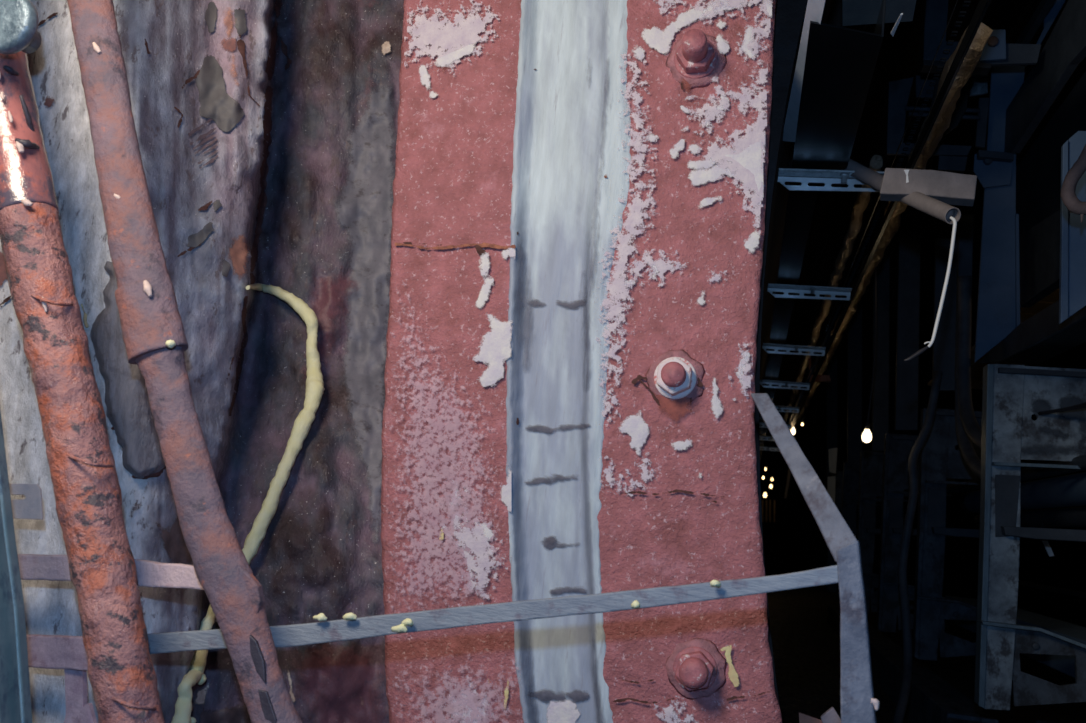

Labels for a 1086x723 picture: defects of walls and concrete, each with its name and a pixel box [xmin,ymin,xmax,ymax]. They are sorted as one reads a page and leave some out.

peeling [404,0,500,98]
spalling [182,55,244,132]
peeling [633,0,772,235]
crack [395,242,516,255]
peeling [654,696,699,723]